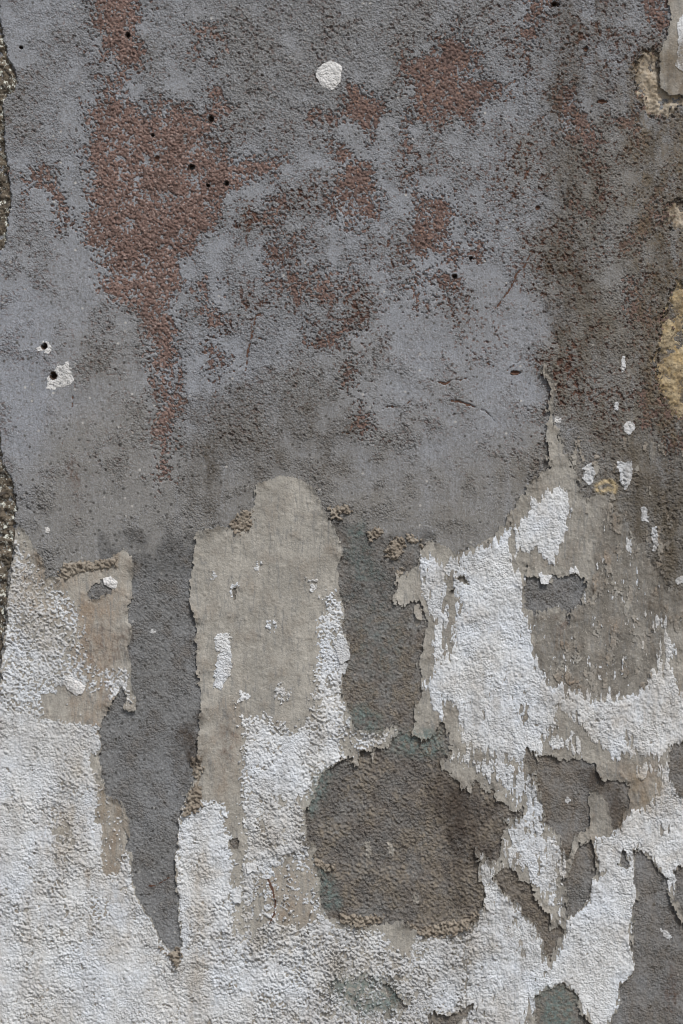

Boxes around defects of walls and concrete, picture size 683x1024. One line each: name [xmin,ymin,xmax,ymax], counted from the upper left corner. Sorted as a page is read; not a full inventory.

spalling [0,0,683,498]
peeling [0,361,683,1024]